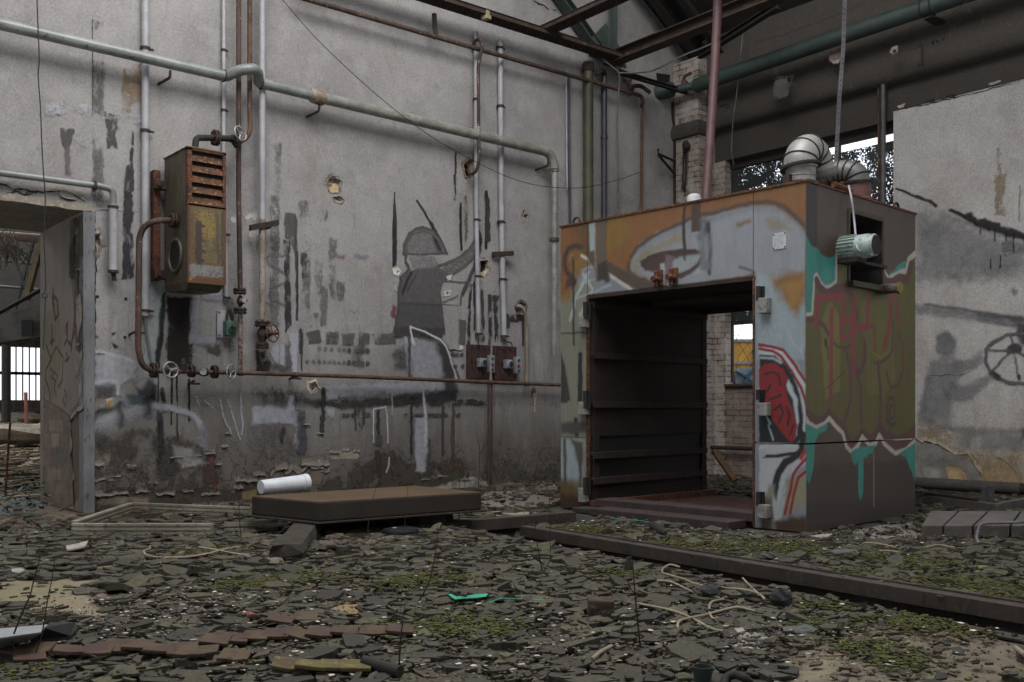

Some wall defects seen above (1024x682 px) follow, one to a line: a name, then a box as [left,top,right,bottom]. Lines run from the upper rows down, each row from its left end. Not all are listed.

spalling [461,157,474,178]
spalling [324,174,345,205]
damp [101,374,219,492]
flaking render [95,448,360,510]
damp [320,450,468,491]
flaking render [912,438,982,481]